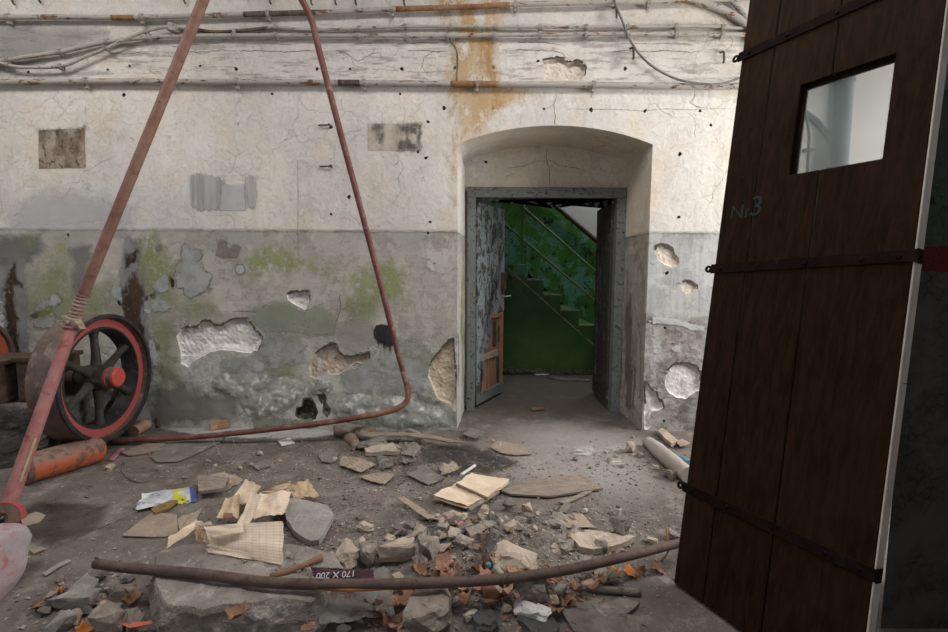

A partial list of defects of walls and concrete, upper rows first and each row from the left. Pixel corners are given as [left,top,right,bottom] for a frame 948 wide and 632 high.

corrosion [396,0,526,129]
flaking render [536,55,587,81]
water stain [0,236,42,353]
water stain [119,239,149,344]
peeling [144,243,212,314]
flaking render [654,243,680,275]
flaking render [176,288,457,408]
flaking render [624,275,705,430]
water stain [160,405,334,439]
flaking render [252,391,331,429]